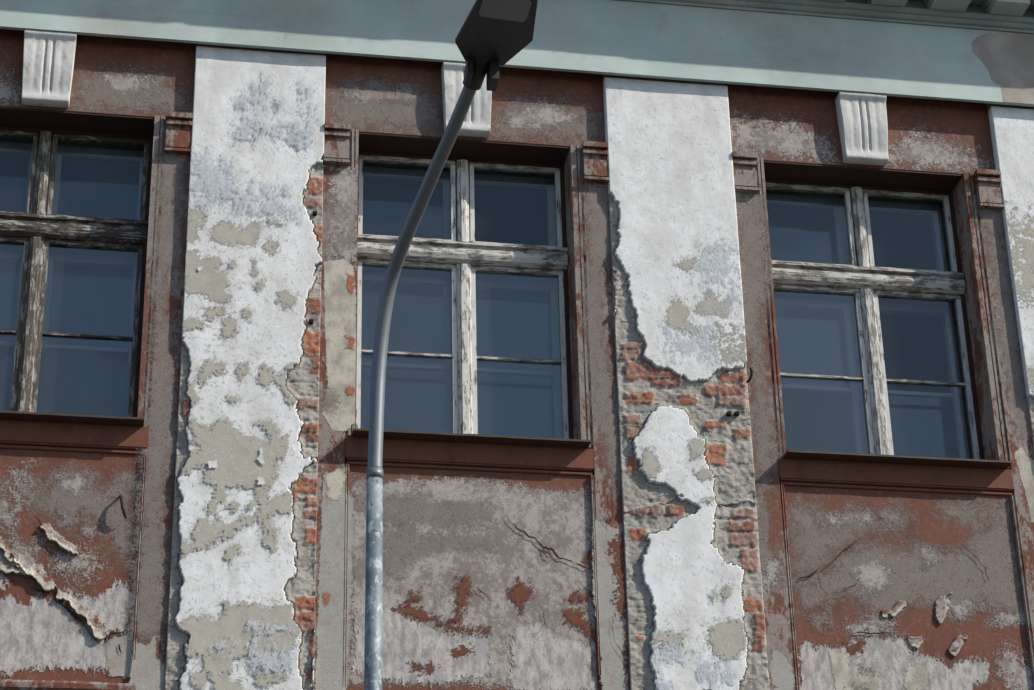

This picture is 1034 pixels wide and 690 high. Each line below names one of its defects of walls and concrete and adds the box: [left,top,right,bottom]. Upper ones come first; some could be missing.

peeling [69,63,193,116]
peeling [325,72,444,136]
peeling [490,93,605,145]
peeling [729,107,843,165]
peeling [880,124,994,173]
peeling [972,32,1034,104]
peeling [0,101,367,690]
spalling [382,182,1034,690]
crack [507,515,593,569]
crack [25,575,128,652]